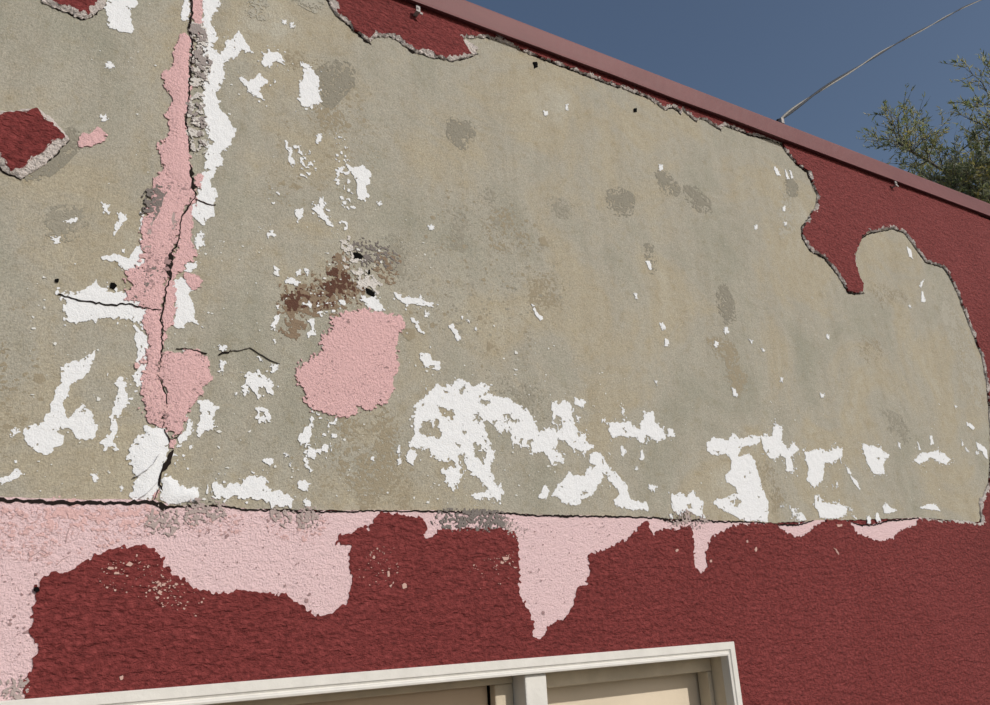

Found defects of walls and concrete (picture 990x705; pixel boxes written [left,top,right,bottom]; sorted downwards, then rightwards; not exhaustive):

crack [326,0,497,62]
crack [531,55,812,184]
flaking render [0,0,207,701]
crack [0,0,465,564]
corrosion [276,252,368,341]
corrosion [373,252,402,285]
flaking render [146,0,990,616]
peeling [512,514,657,639]
crack [489,512,814,526]
crack [846,517,919,527]